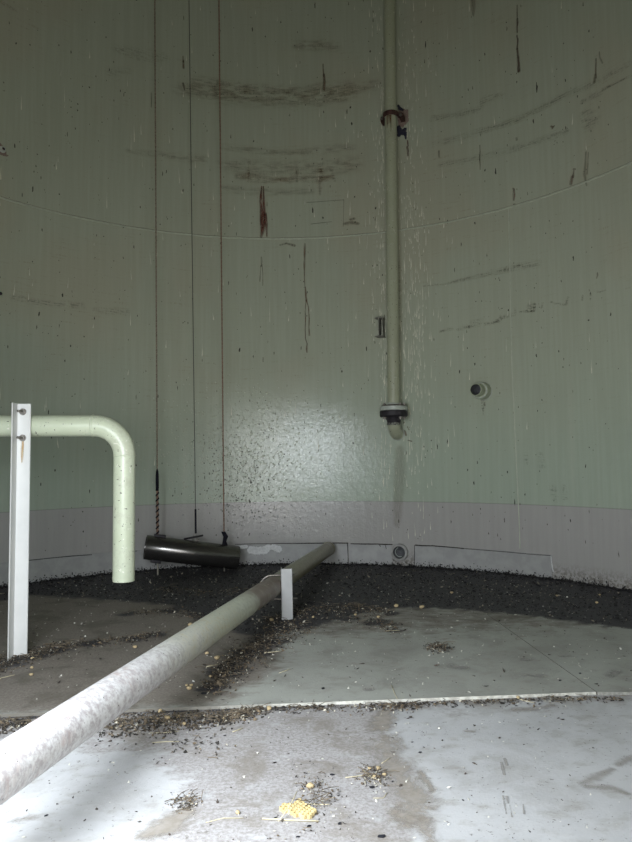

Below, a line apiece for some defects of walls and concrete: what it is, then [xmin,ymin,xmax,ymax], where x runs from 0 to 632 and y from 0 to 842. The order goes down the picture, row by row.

corrosion [259,186,268,238]